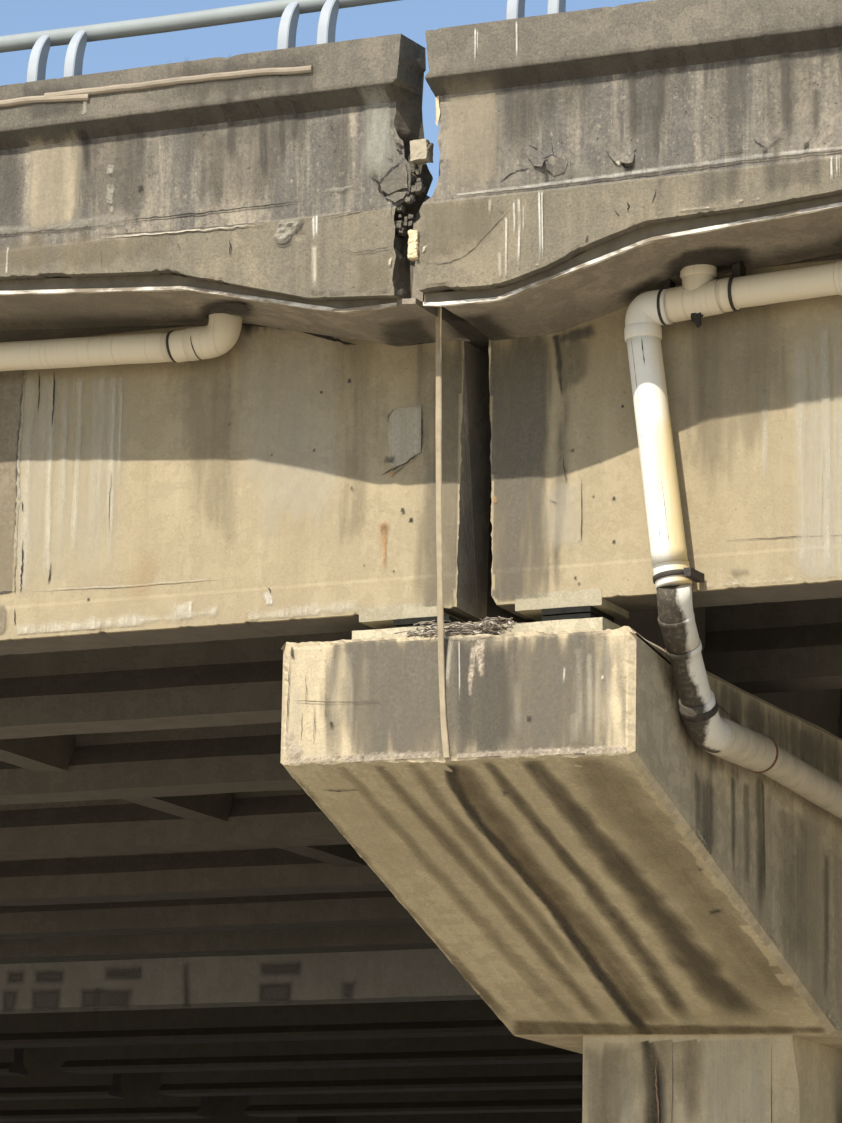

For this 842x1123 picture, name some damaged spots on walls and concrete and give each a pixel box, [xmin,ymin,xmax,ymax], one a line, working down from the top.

crack [327,143,408,217]
leakage [450,92,494,173]
efflorescence [43,424,78,569]
leakage [453,319,557,600]
leakage [327,631,821,1123]
leakage [260,964,300,1002]